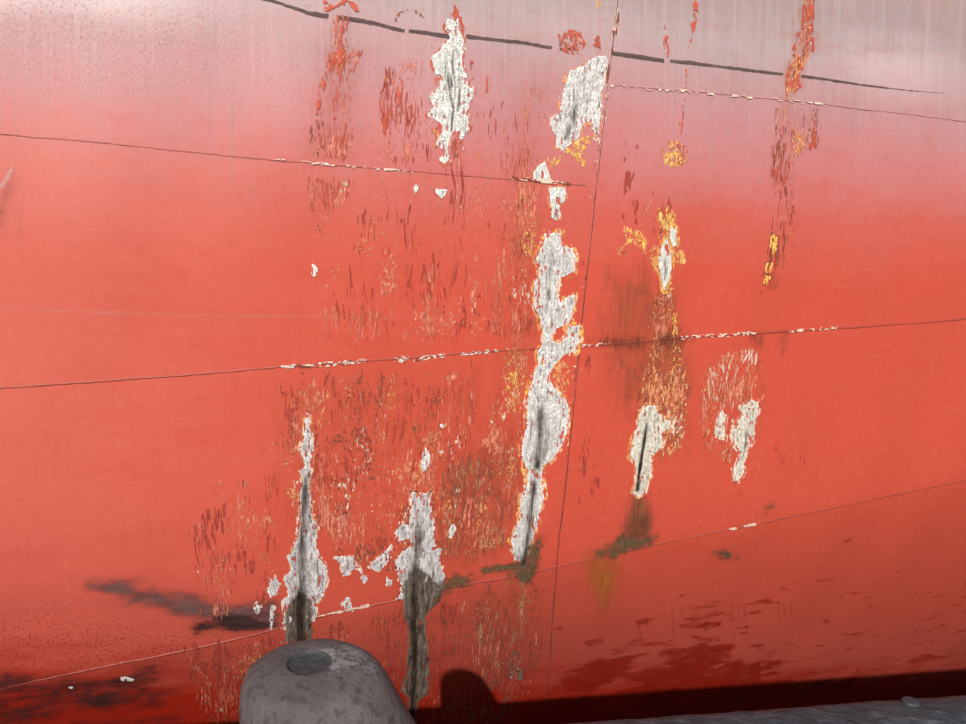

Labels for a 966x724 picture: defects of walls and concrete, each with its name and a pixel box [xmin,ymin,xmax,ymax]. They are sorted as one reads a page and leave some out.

corrosion [308,14,363,161]
peeling [425,17,477,167]
corrosion [442,5,466,43]
corrosion [760,0,820,293]
corrosion [267,57,545,574]
peeling [503,48,714,565]
spalling [681,331,756,340]
peeling [713,398,761,484]
corrosion [186,473,278,621]
peeling [253,413,456,723]
corrosion [626,494,650,538]
corrosion [312,579,546,724]